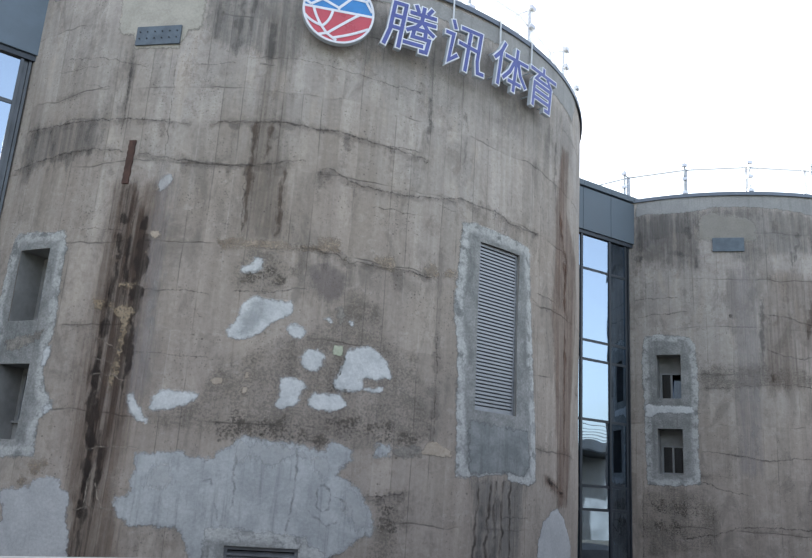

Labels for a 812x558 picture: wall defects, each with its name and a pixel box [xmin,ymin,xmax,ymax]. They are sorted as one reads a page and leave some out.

rust [121,140,137,184]
water stain [244,123,258,206]
water stain [472,481,511,558]